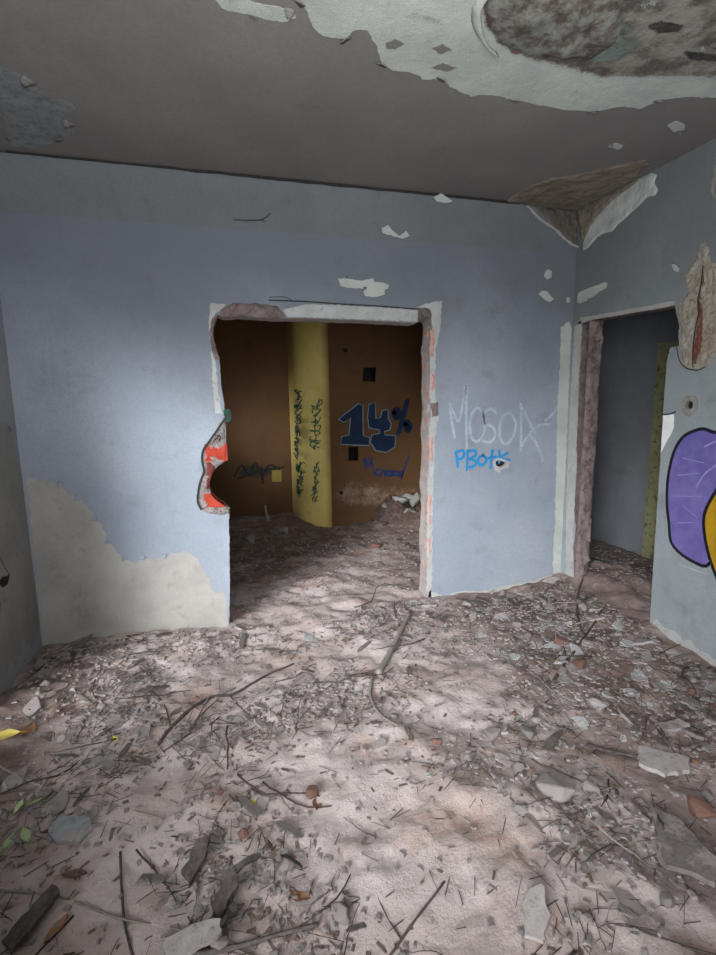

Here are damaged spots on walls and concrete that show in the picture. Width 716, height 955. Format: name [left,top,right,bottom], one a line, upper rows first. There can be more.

peeling [216,0,716,113]
leakage [482,0,716,79]
peeling [668,121,685,134]
peeling [434,194,452,203]
spalling [507,160,658,250]
spalling [196,242,716,597]
peeling [0,421,228,695]
peeling [653,619,716,667]